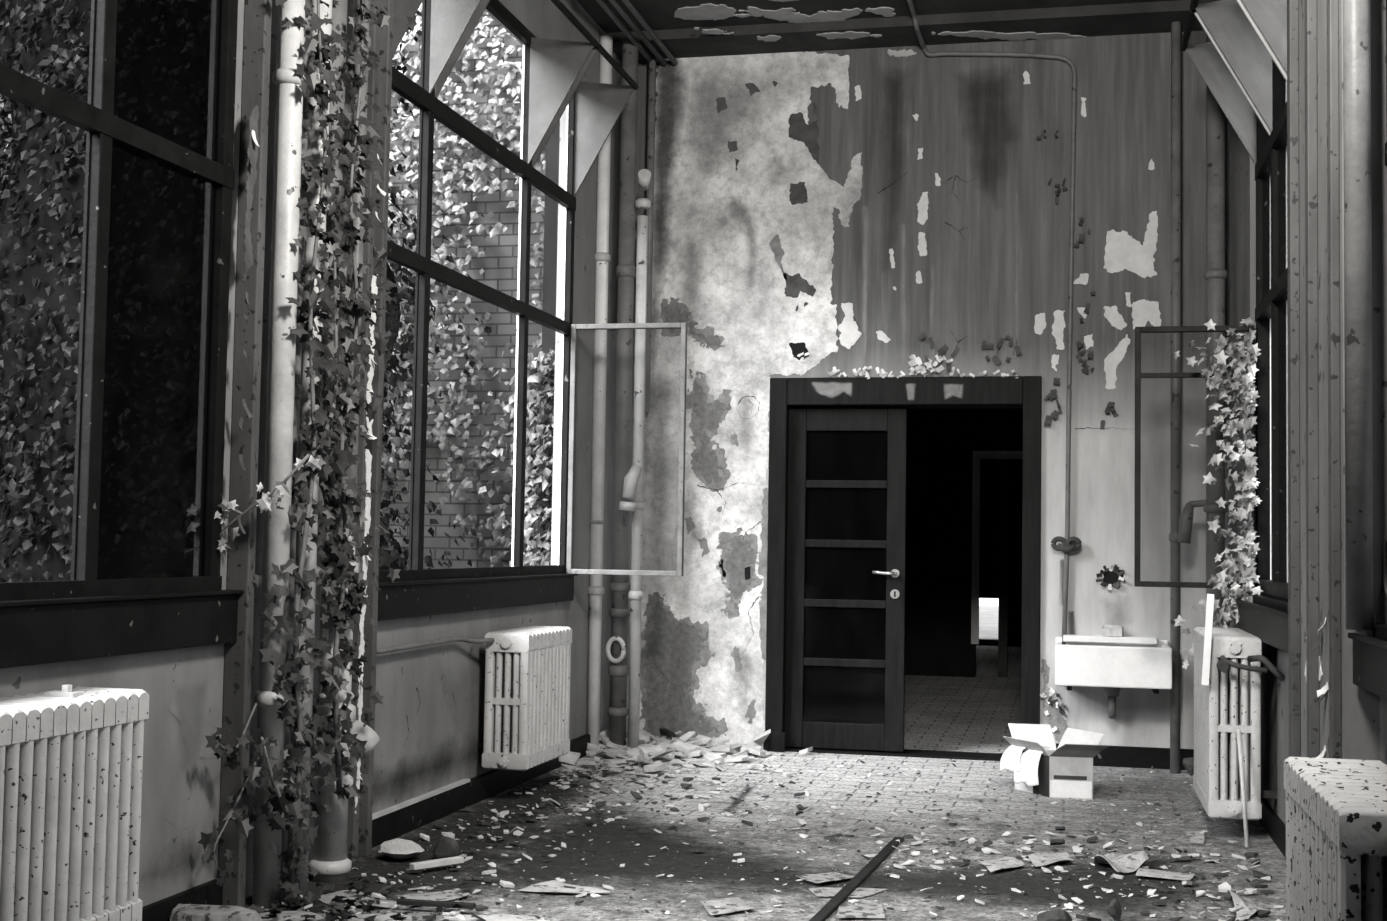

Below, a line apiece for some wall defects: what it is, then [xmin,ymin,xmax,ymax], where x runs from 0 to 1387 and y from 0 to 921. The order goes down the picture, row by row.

peeling [931,30,1087,41]
peeling [1034,211,1162,429]
peeling [639,0,1022,749]
spalling [1096,564,1125,590]
spalling [1040,659,1068,743]